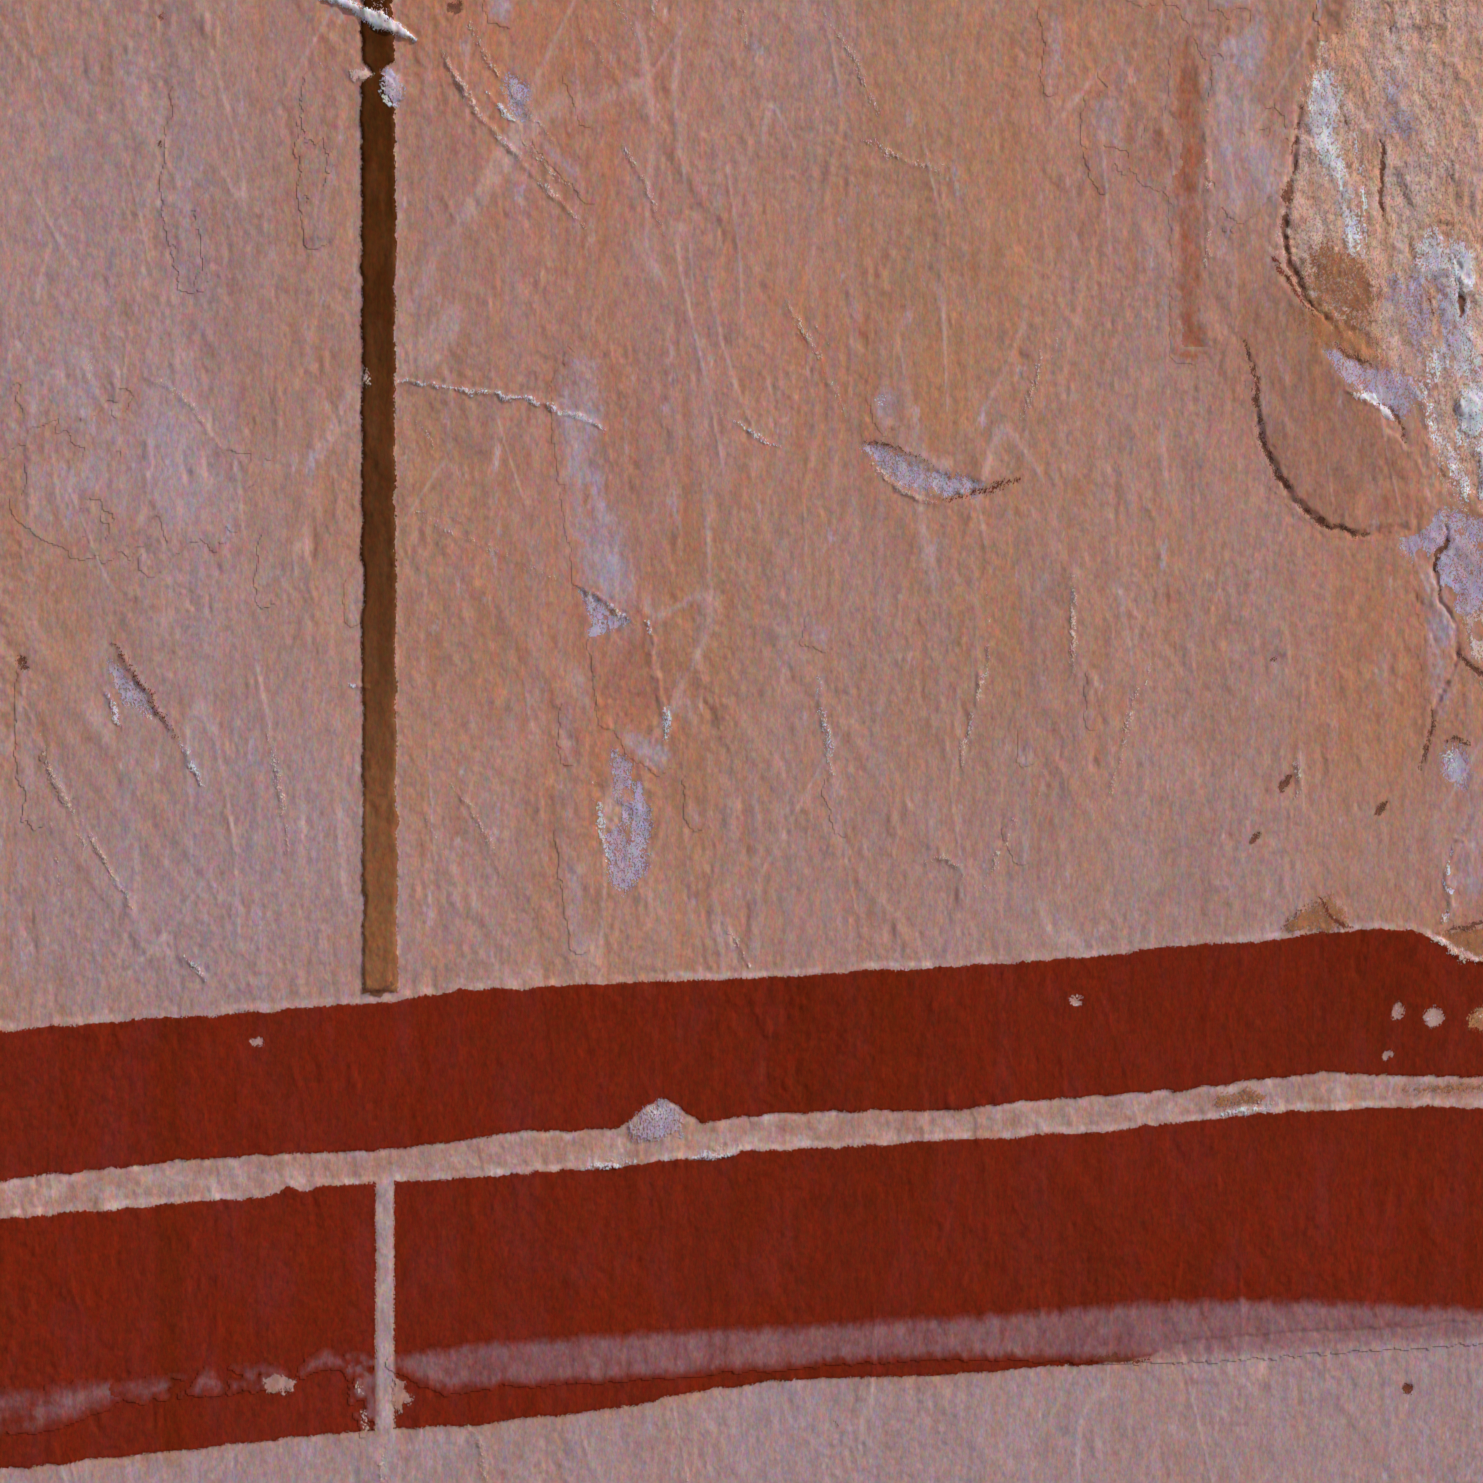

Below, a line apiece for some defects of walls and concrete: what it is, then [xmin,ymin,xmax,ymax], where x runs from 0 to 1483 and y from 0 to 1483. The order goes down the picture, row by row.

spalling [447,0,464,14]
peeling [483,0,518,28]
crack [1272,256,1315,317]
spalling [1269,0,1483,723]
spalling [857,380,1021,504]
crack [1243,340,1370,539]
crack [1378,403,1407,443]
crack [1433,517,1450,595]
crack [1456,653,1483,688]
crack [1418,709,1471,771]